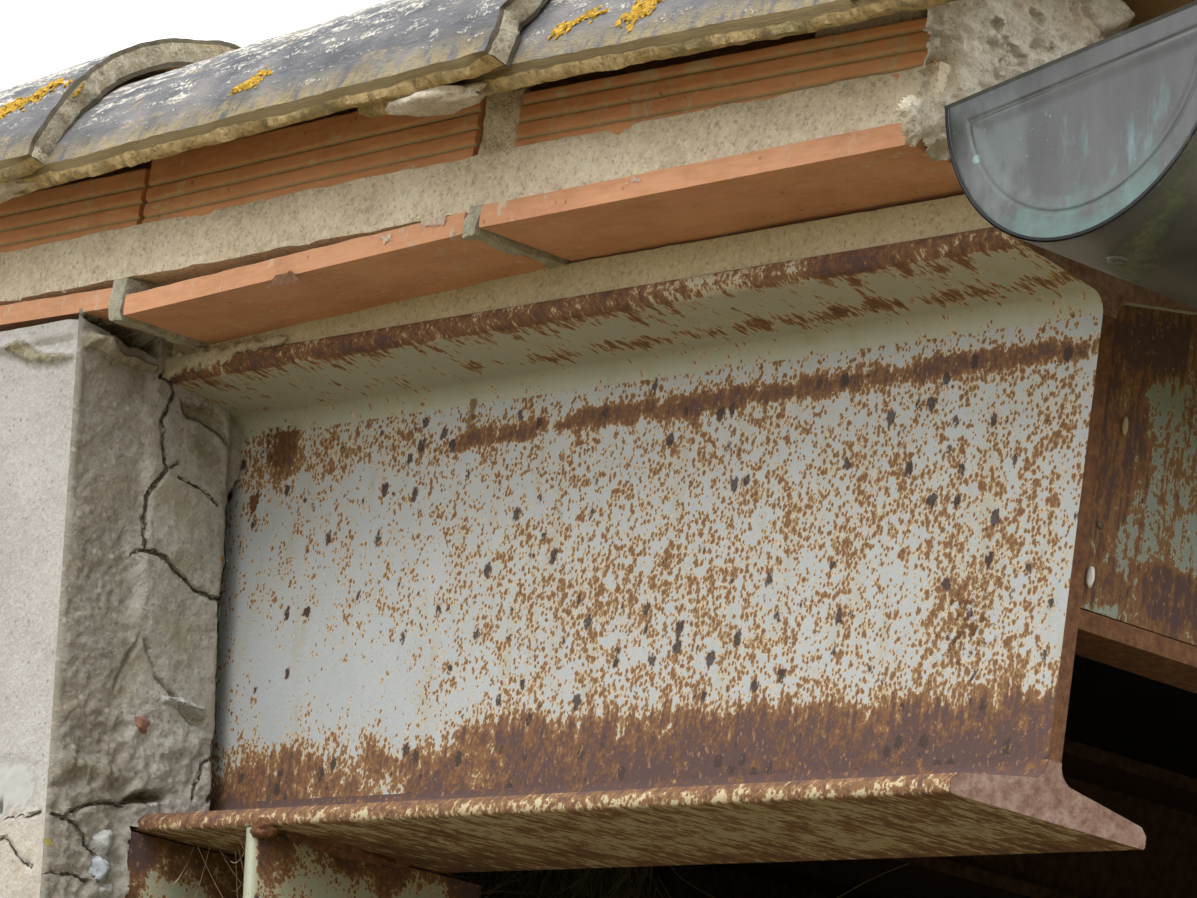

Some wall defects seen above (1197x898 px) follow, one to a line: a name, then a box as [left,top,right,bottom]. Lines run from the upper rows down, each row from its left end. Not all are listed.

corrosion [465,398,476,446]
corrosion [256,424,299,483]
corrosion [248,494,258,513]
crack [130,376,227,802]
corrosion [931,578,996,672]
peeling [0,763,35,817]
crack [0,802,123,883]